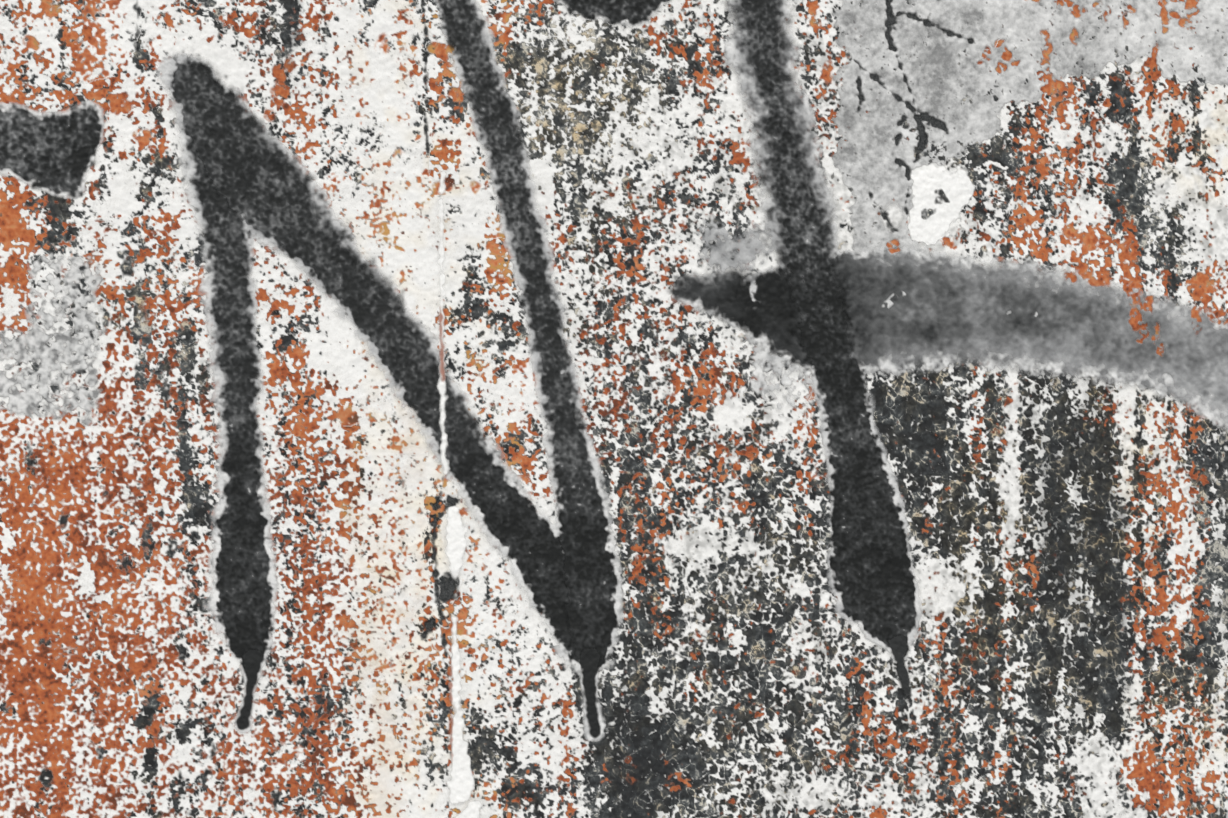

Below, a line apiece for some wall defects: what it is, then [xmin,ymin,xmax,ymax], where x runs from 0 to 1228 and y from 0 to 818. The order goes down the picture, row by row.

peeling [0,0,476,818]
spalling [412,0,551,499]
spalling [457,0,1228,818]
crack [846,0,974,232]